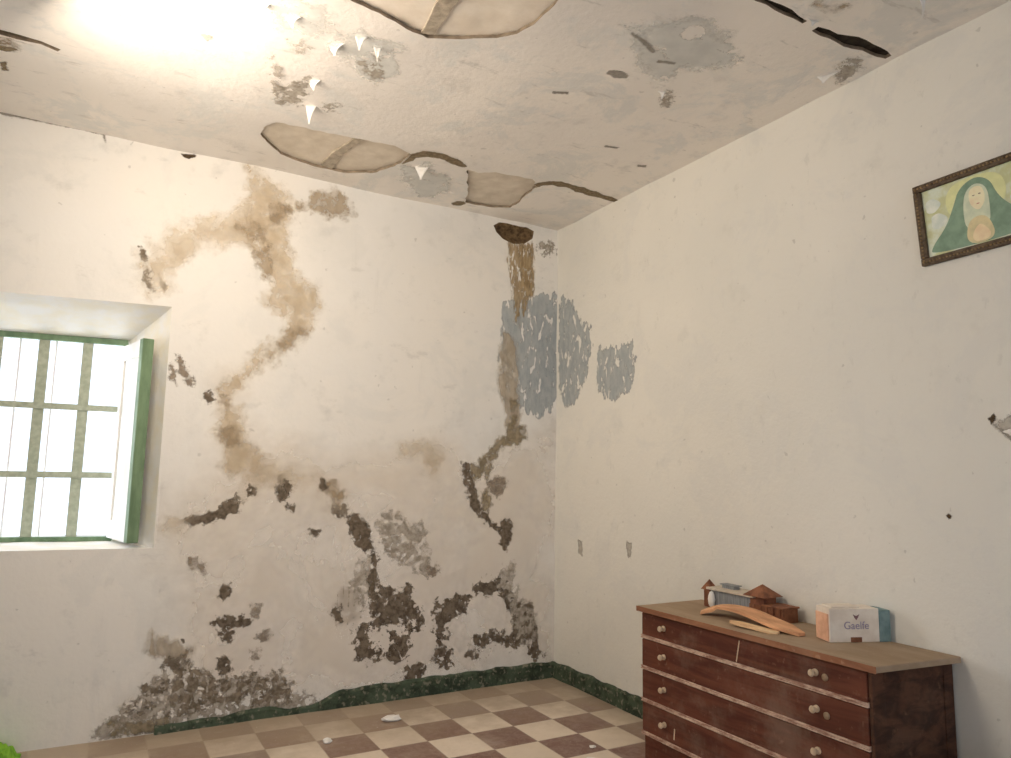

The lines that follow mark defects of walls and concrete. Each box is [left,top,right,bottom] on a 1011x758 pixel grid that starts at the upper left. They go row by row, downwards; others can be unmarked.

crack [0,30,32,52]
peeling [261,0,403,82]
spalling [359,0,555,36]
peeling [632,18,736,108]
crack [765,0,889,84]
water stain [215,178,349,393]
peeling [497,292,637,419]
water stain [221,409,294,483]
peeling [988,414,1011,440]
peeling [218,582,232,600]
peeling [210,603,270,644]
spalling [92,633,316,740]